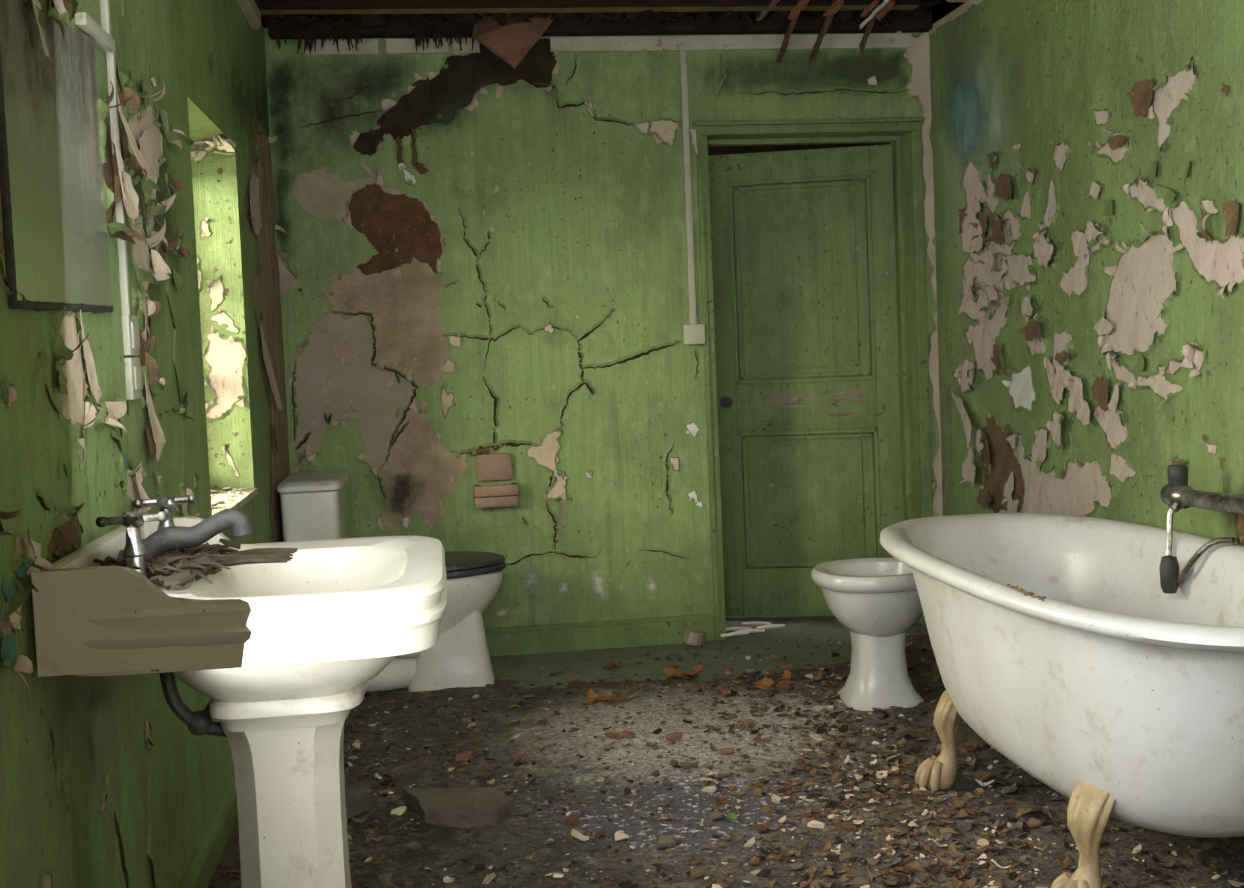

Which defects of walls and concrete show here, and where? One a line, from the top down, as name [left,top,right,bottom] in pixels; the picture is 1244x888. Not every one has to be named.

peeling [20,0,80,59]
spalling [46,38,559,542]
crack [442,207,702,565]
peeling [882,30,1244,517]